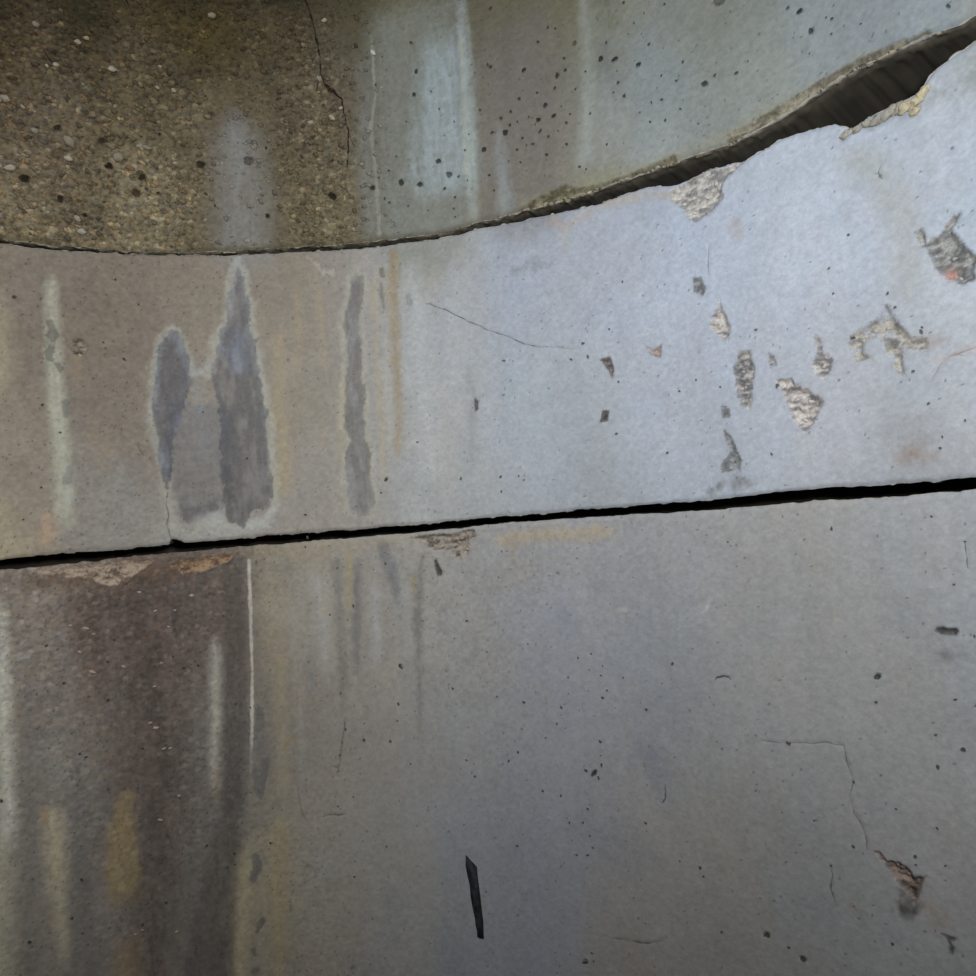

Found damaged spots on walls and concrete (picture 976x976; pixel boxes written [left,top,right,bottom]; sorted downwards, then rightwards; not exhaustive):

crack [304,0,355,166]
spalling [725,27,934,145]
damp [141,98,289,540]
damp [304,0,648,522]
crack [425,303,575,349]
spalling [669,162,744,224]
spalling [847,291,930,377]
spalling [913,210,976,287]
spalling [25,552,237,587]
damp [246,561,271,802]
damp [0,570,229,976]
crack [761,740,868,849]